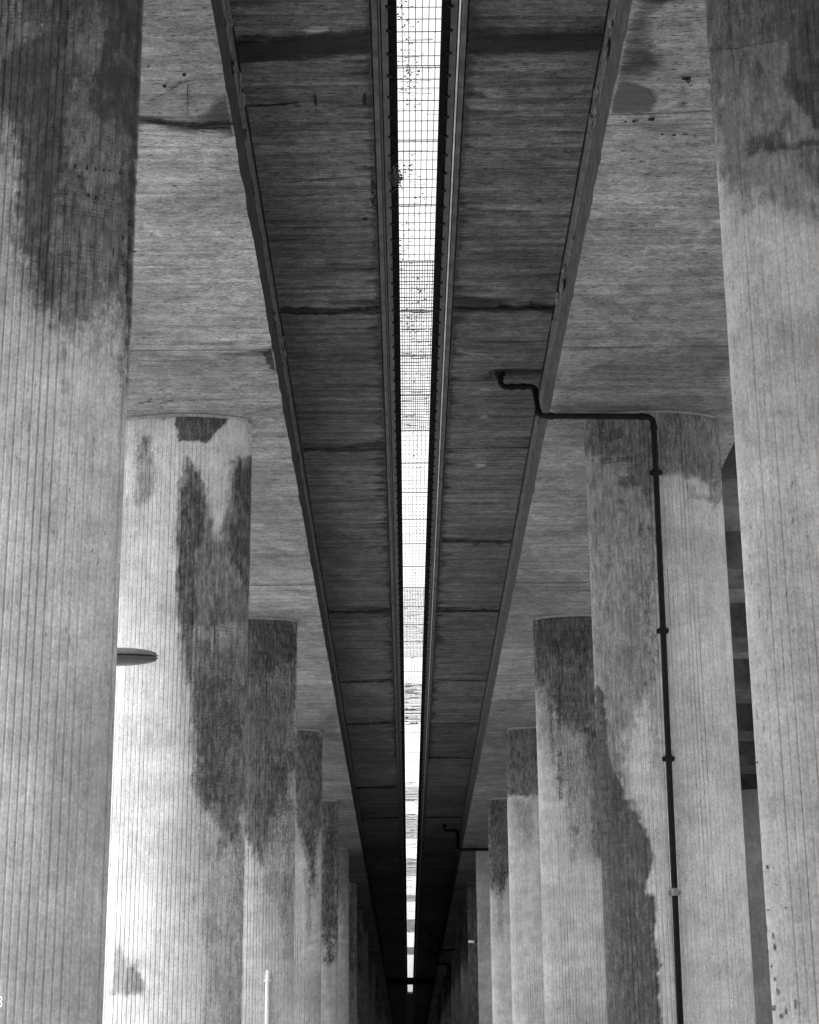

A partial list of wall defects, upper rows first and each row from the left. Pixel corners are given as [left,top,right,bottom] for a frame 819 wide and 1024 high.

leakage [0,0,232,384]
leakage [710,0,819,217]
leakage [176,458,382,1017]
leakage [488,728,538,892]
leakage [533,413,719,1024]